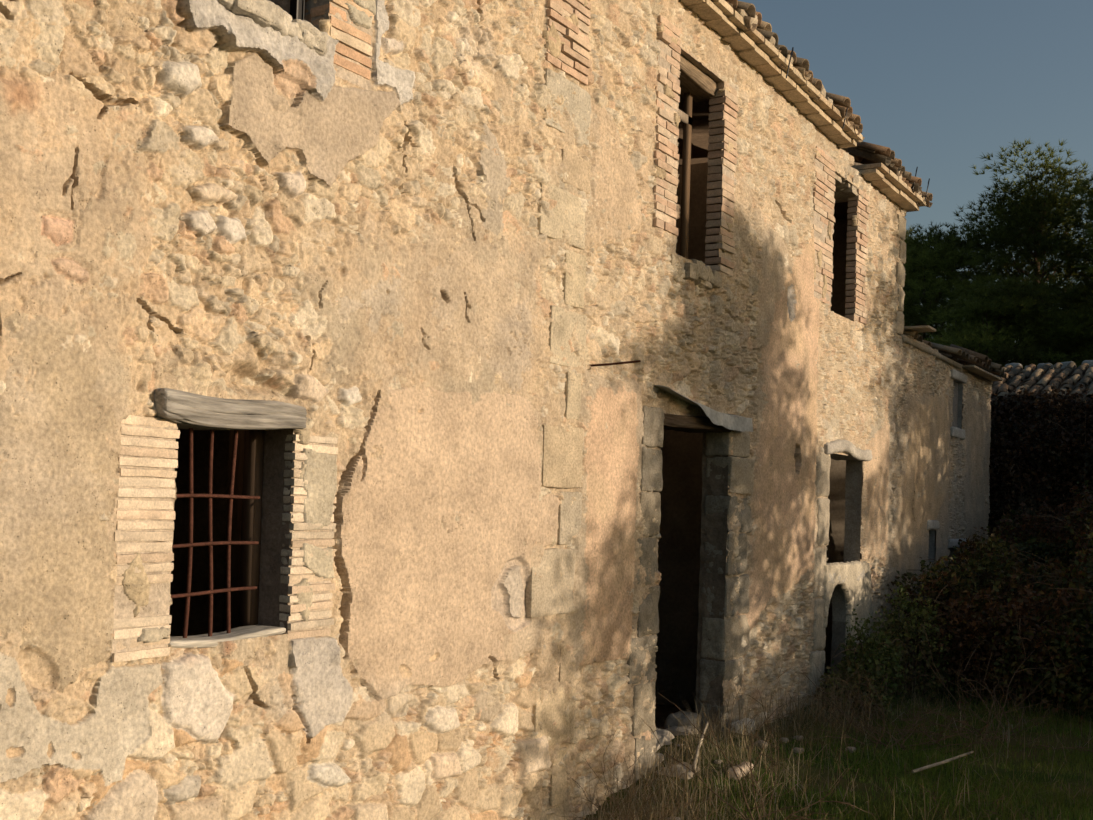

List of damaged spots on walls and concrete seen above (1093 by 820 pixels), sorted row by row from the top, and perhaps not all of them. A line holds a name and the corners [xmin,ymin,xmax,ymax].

spalling [0,0,548,363]
flaking render [0,248,561,820]
spalling [568,0,729,820]
flaking render [736,80,950,730]